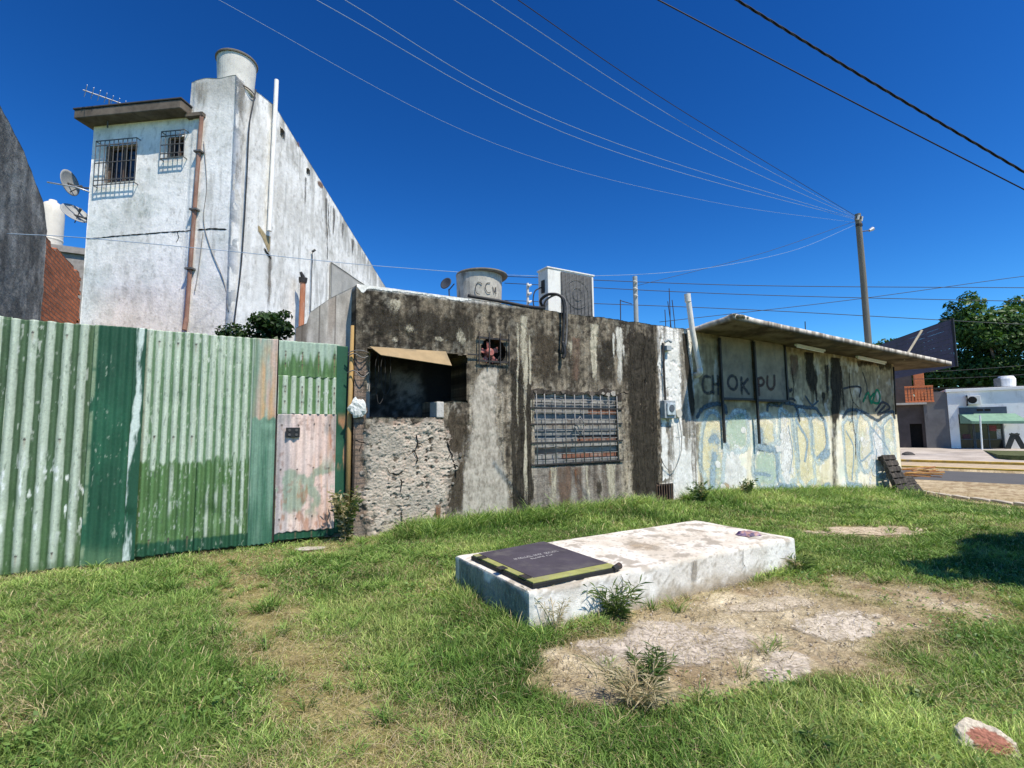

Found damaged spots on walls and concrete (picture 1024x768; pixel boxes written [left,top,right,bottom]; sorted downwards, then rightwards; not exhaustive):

leakage [325,199,354,253]
leakage [373,299,474,342]
spalling [356,417,463,537]
crack [386,434,459,526]
leakage [444,412,466,511]
leakage [510,316,555,509]
leakage [585,464,616,502]
leakage [590,324,705,496]
leakage [804,352,845,482]